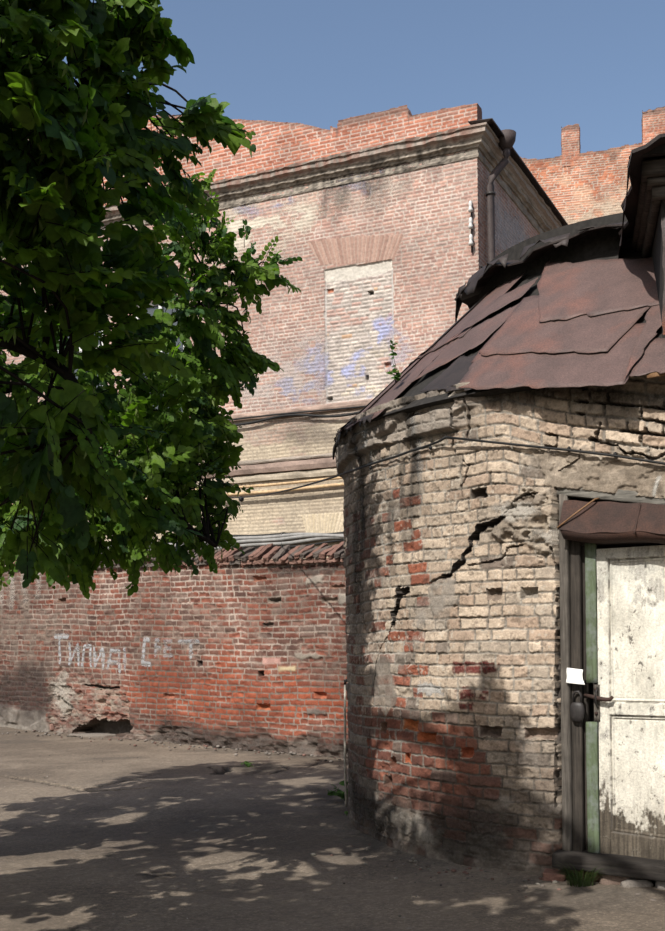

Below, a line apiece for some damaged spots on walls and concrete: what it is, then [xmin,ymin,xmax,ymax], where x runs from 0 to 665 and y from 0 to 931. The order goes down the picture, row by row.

crack [544,389,665,472]
crack [207,492,538,775]
spalling [46,667,133,738]
peeling [611,797,665,839]